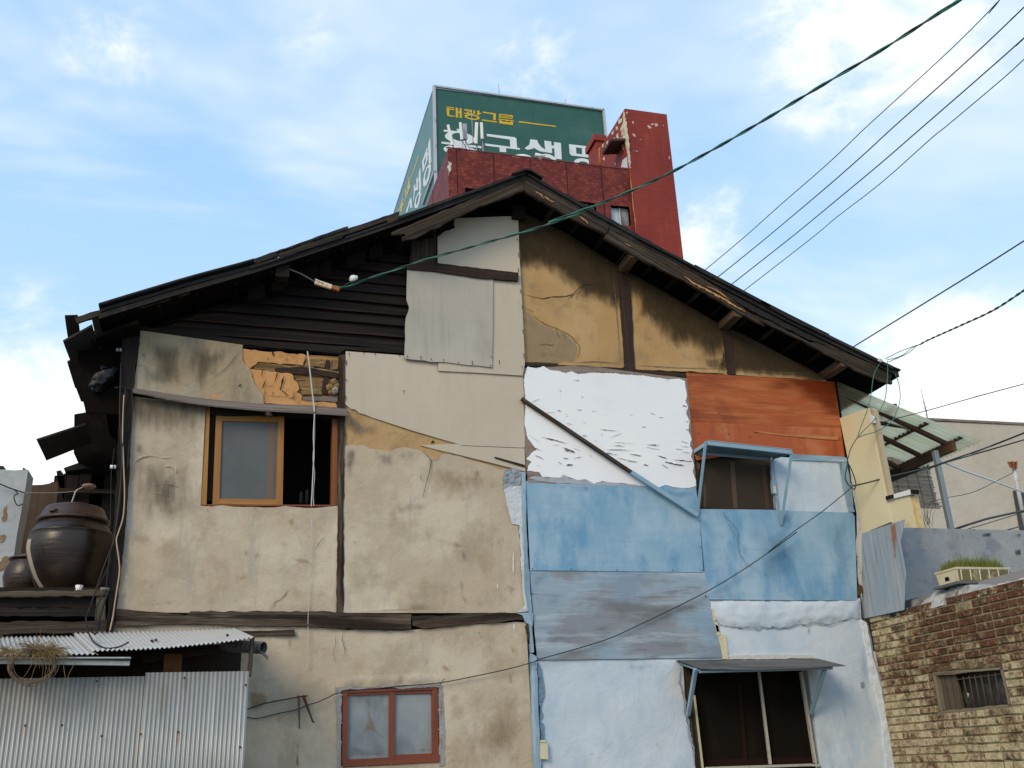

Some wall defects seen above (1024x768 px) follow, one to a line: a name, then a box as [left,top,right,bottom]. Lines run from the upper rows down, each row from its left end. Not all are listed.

peeling [602,111,641,168]
crack [524,282,606,361]
damp [518,214,837,409]
damp [133,398,206,417]
peeling [242,349,696,488]